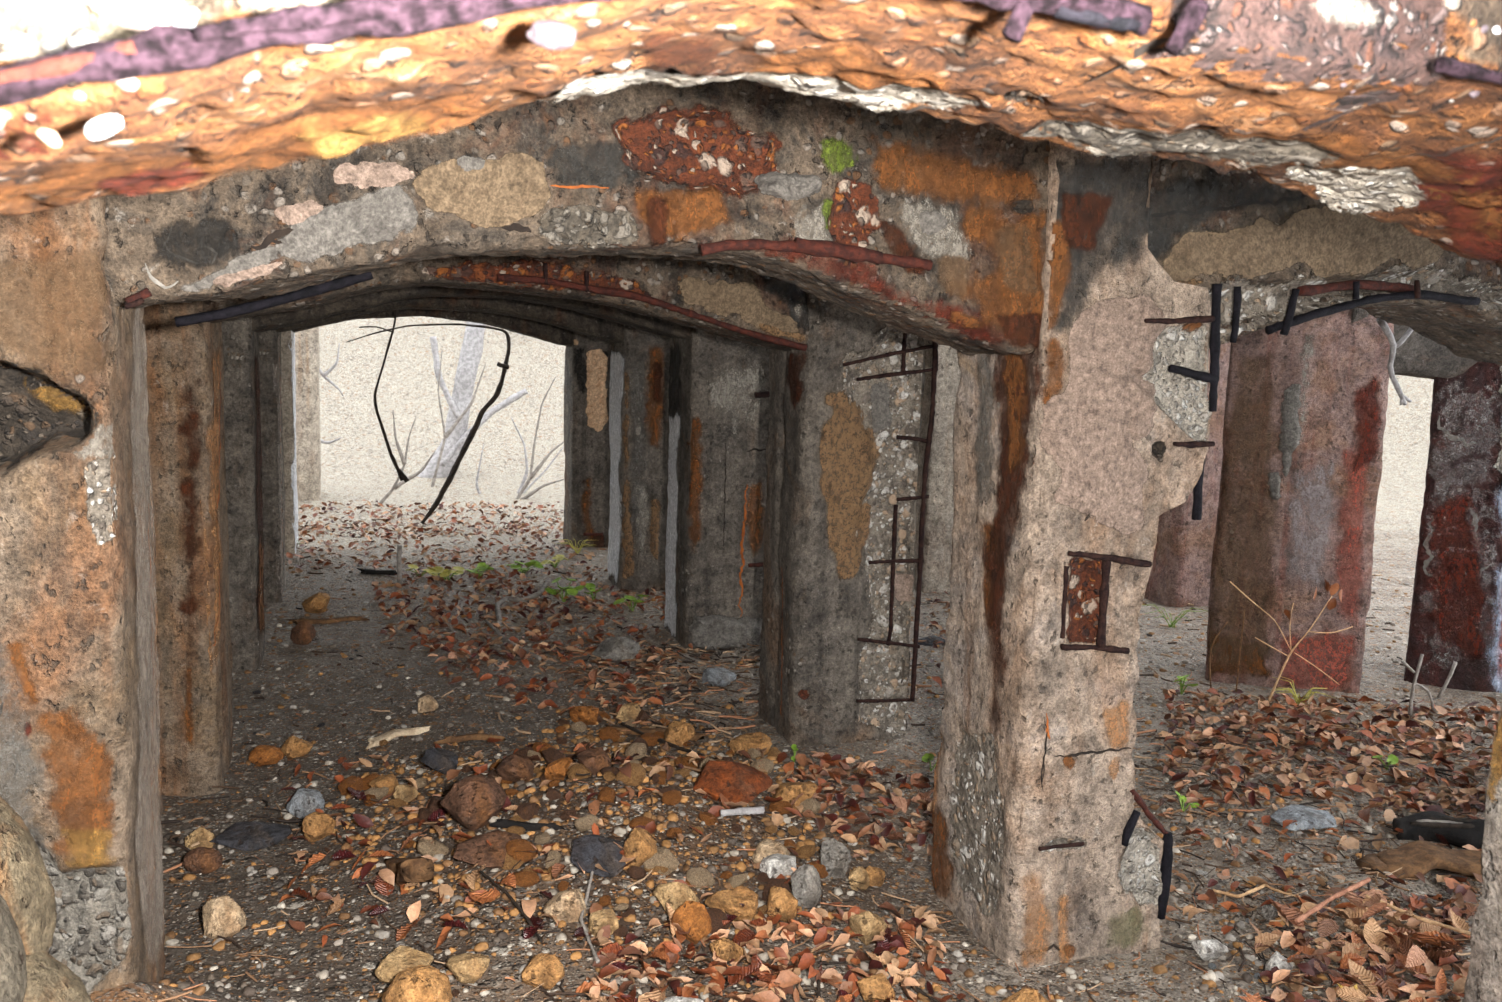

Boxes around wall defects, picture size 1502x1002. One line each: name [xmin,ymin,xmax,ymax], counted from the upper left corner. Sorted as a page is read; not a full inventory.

spalling [954,0,1502,535]
spalling [0,360,118,545]
spalling [819,326,923,737]
rust [762,137,1063,730]
spalling [1060,551,1152,654]
rust [1209,358,1381,691]
rust [1428,495,1487,659]
rust [7,642,114,868]
rust [1489,716,1502,798]